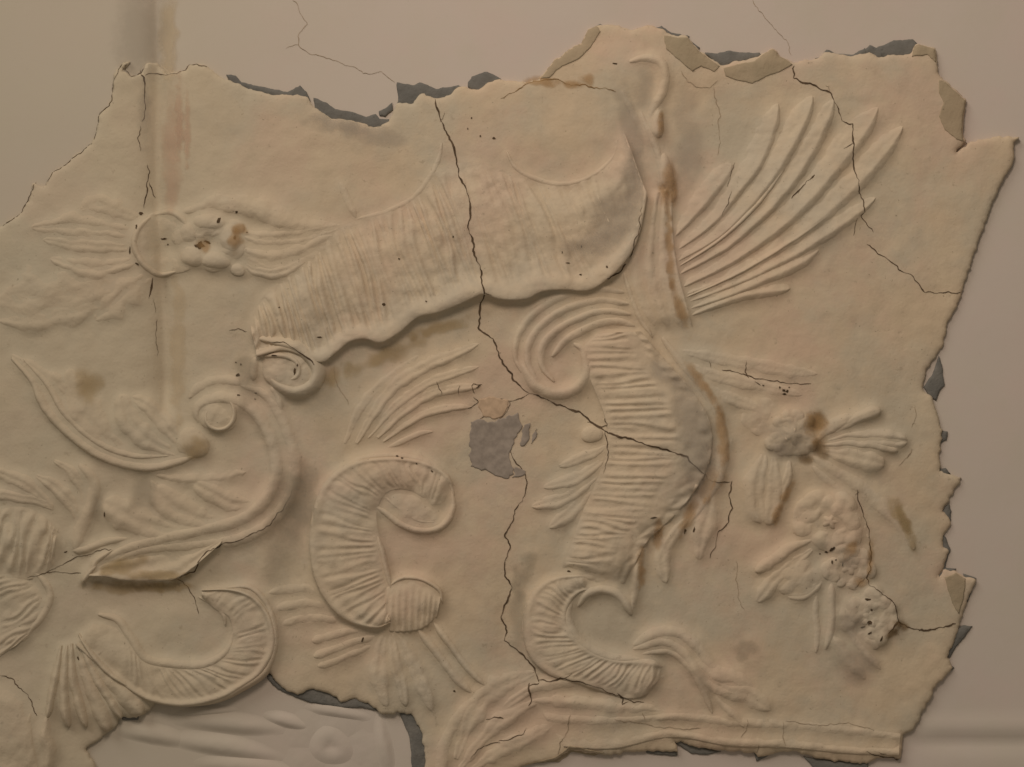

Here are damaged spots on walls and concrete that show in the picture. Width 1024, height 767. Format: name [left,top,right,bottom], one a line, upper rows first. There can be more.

crack [6,62,207,223]
peeling [227,72,500,127]
crack [681,71,735,214]
flaking render [656,26,793,83]
crack [753,2,961,294]
peeling [818,39,936,62]
flaking render [939,80,965,141]
crack [435,100,733,557]
peeling [520,423,537,446]
crack [475,451,697,753]
crack [857,490,956,631]
crack [783,721,899,760]